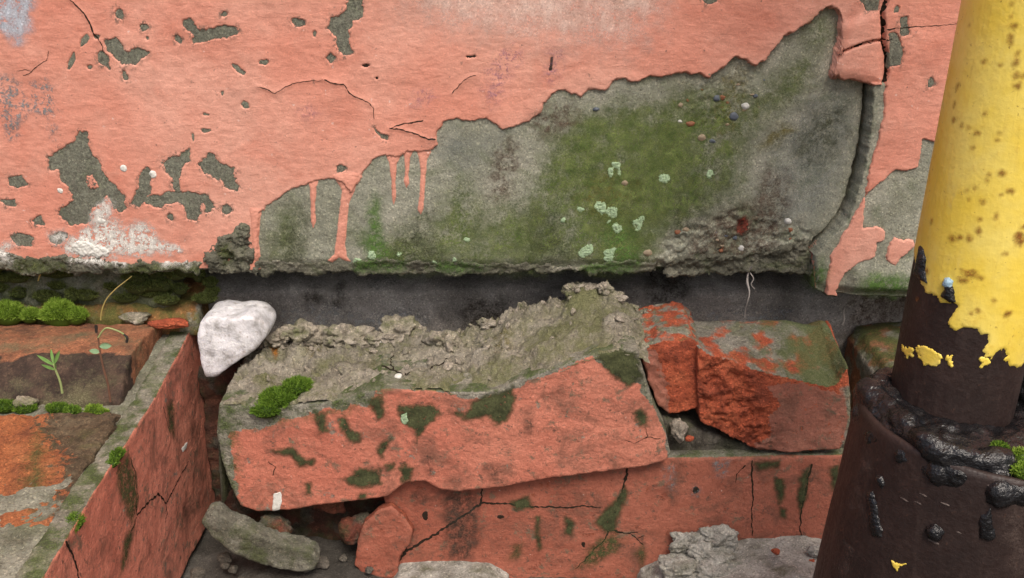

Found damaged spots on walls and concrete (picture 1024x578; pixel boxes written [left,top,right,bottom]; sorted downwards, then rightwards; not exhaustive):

crack [70,0,104,52]
crack [839,0,957,83]
crack [260,79,436,140]
flaking render [0,0,934,296]
leakage [50,199,187,266]
crack [131,407,189,531]
crack [400,468,628,561]
crack [575,530,645,569]